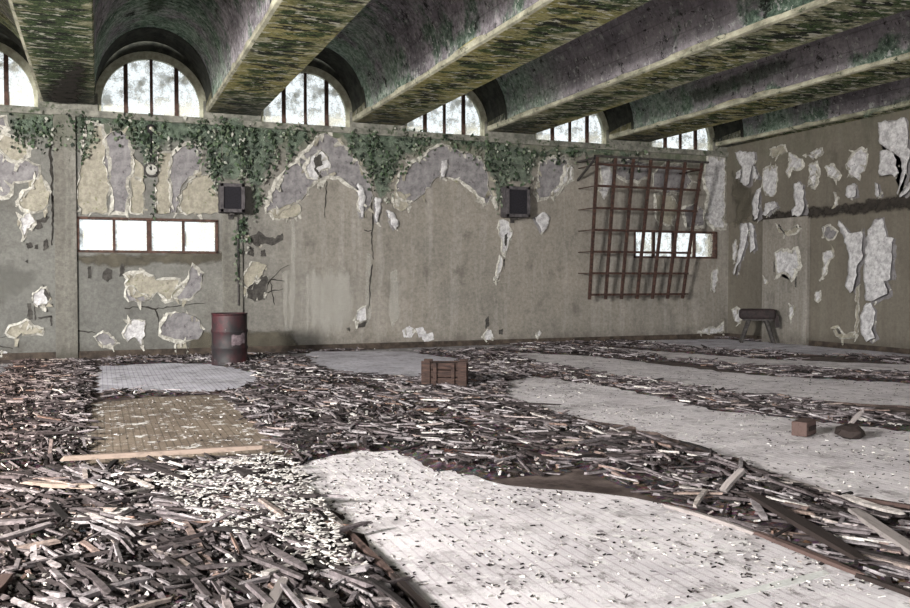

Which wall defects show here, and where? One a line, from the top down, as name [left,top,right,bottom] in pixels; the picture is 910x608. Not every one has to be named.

peeling [0,115,52,251]
peeling [76,120,219,219]
peeling [263,126,498,231]
peeling [597,117,910,287]
peeling [0,284,53,357]
peeling [87,262,205,355]
peeling [243,231,284,302]
peeling [493,219,513,285]
peeling [710,267,720,293]
peeling [697,306,742,336]
peeling [814,217,897,346]